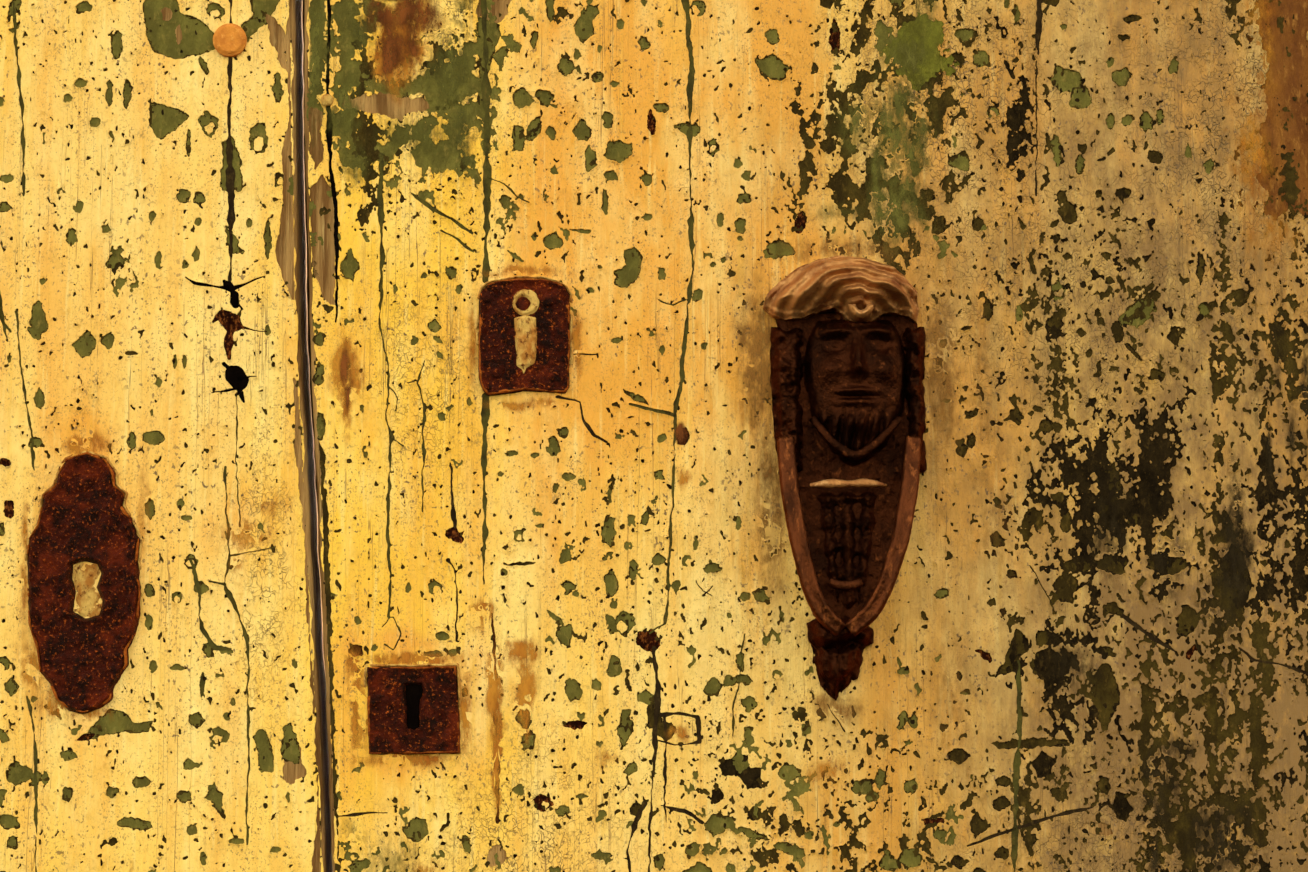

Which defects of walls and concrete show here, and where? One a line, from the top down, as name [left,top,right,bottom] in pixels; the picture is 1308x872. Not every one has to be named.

corrosion [369,0,439,89]
peeling [0,156,162,369]
peeling [19,375,98,473]
corrosion [68,433,105,454]
peeling [107,322,303,482]
crack [185,57,276,845]
crack [626,0,745,872]
peeling [312,0,1308,872]
peeling [142,486,306,570]
corrosion [346,652,368,744]
corrosion [371,754,439,766]
corrosion [459,684,470,738]